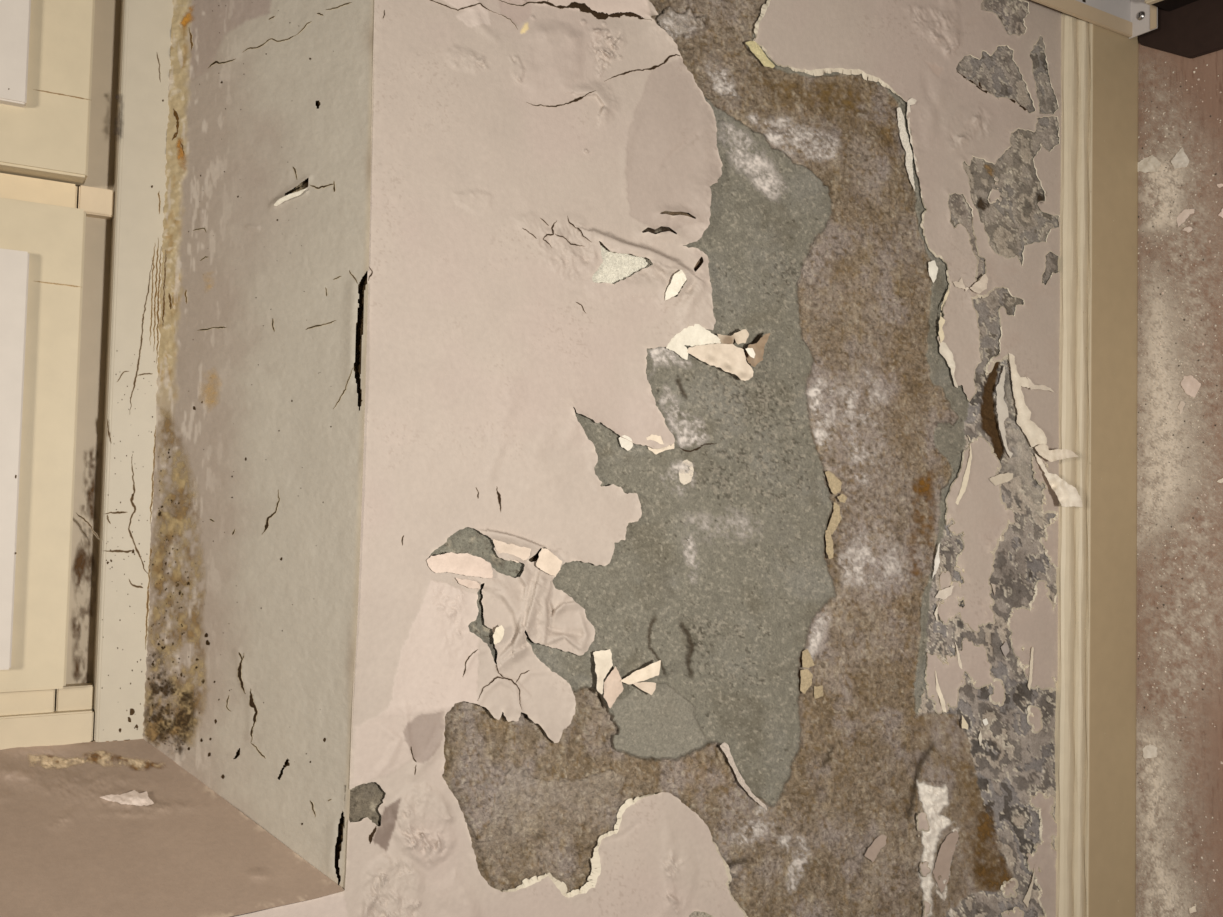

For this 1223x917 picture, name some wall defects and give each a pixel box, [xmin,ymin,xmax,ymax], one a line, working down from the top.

crack [189,2,352,68]
crack [429,0,652,30]
crack [526,54,680,108]
crack [172,109,185,155]
crack [293,167,336,192]
crack [306,267,373,411]
flaking render [421,0,1083,917]
crack [210,490,280,535]
mould [145,414,210,753]
crack [226,652,266,759]